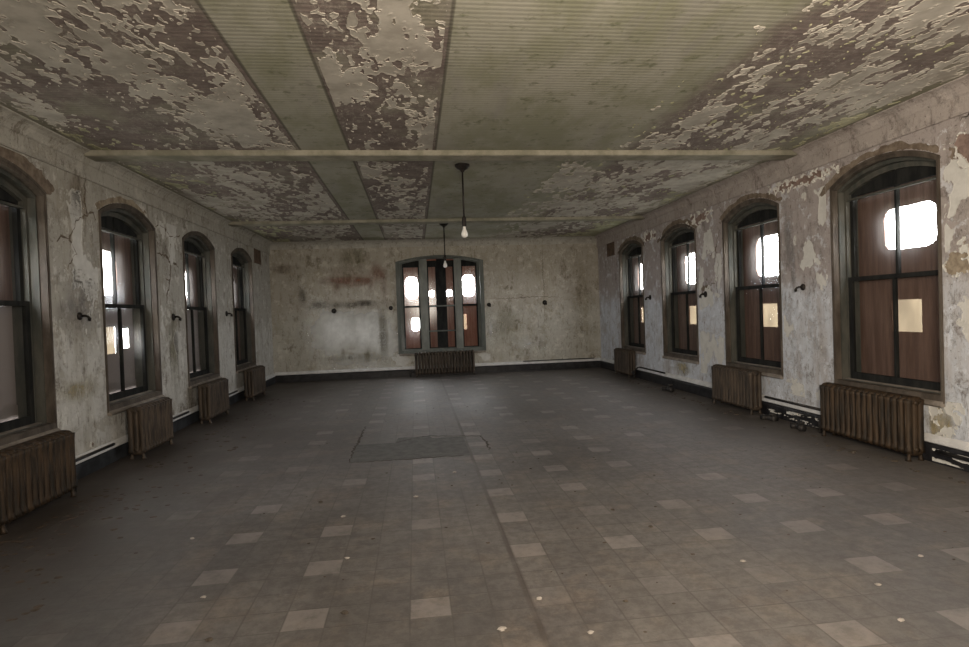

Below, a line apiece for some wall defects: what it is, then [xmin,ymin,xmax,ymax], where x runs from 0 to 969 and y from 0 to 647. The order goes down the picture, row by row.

peeling [0,0,359,242]
peeling [300,0,447,240]
peeling [505,0,969,218]
peeling [956,296,969,343]